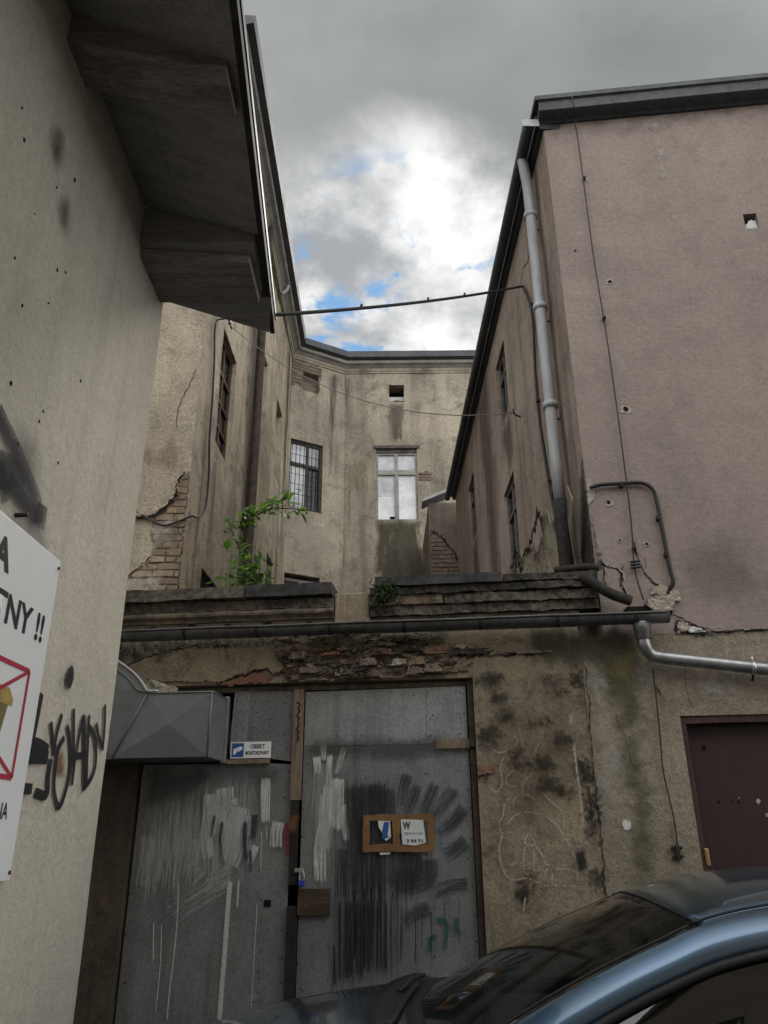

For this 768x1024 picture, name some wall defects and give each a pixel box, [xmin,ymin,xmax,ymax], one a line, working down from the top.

spalling [126,471,191,591]
water stain [377,521,424,577]
spalling [429,530,459,574]
flaking render [510,461,690,631]
spalling [127,633,473,687]
water stain [475,671,601,842]
crack [585,667,641,897]